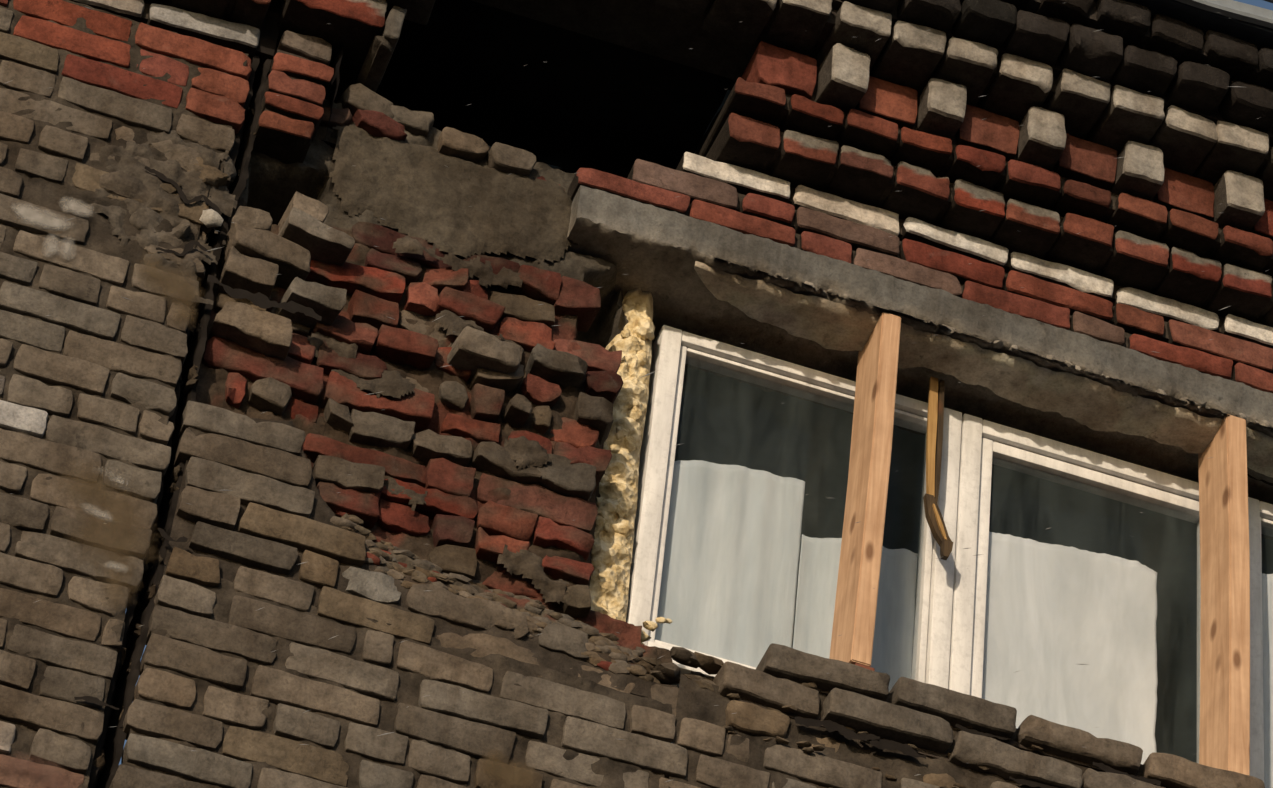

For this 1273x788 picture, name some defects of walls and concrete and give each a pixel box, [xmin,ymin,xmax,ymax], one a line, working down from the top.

crack [74,0,322,788]
spalling [81,0,732,698]